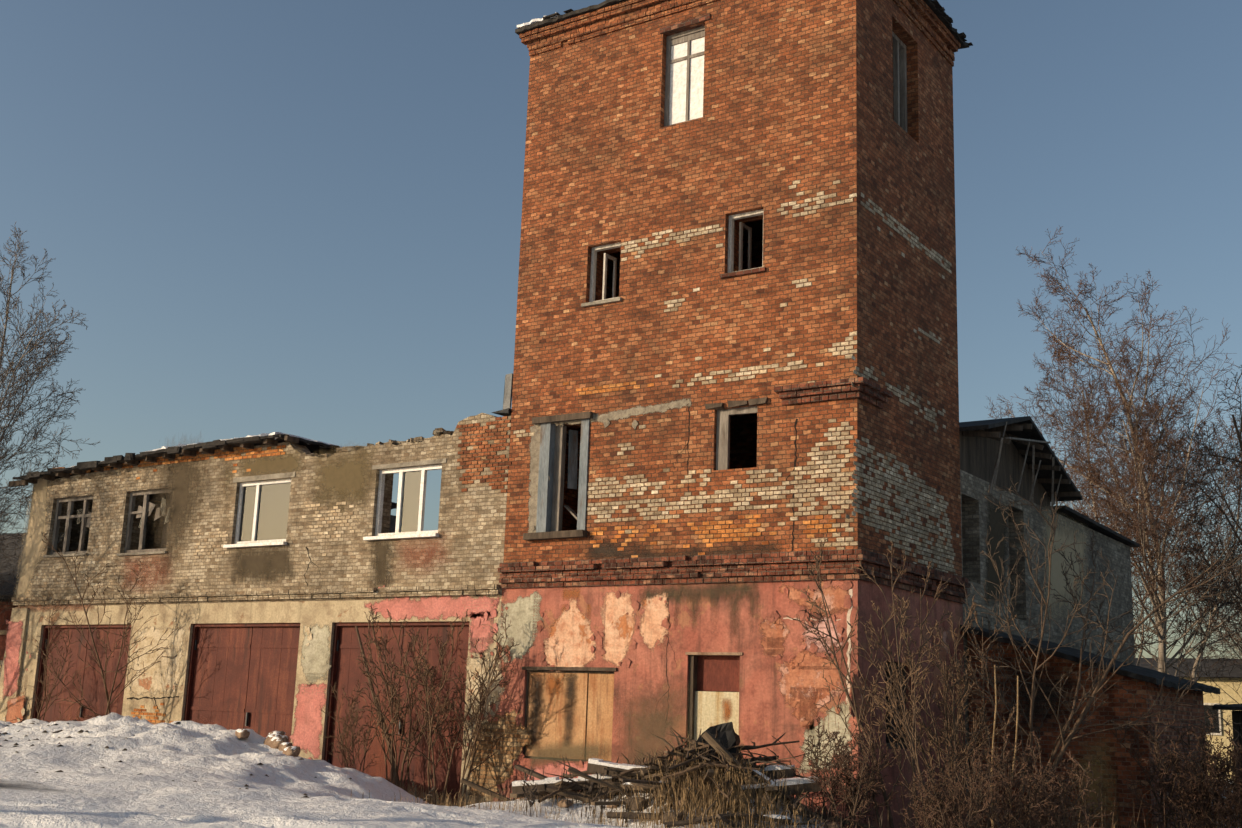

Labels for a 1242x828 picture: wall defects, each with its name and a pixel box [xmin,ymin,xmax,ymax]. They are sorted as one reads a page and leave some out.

peeling [2,620,31,723]
flaking render [364,586,670,800]
flaking render [759,580,873,773]